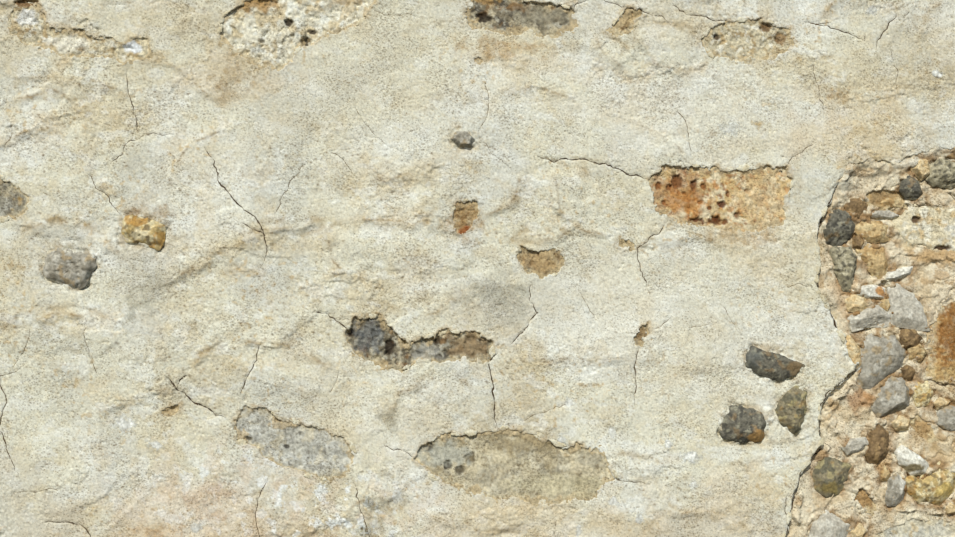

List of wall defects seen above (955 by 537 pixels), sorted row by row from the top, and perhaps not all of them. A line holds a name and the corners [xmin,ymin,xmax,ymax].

spalling [217,0,376,71]
spalling [465,0,578,39]
spalling [701,17,794,64]
spalling [0,174,29,223]
crack [207,152,303,268]
spalling [649,164,794,232]
spalling [517,246,565,279]
spalling [345,313,496,373]
spalling [780,145,955,537]
spalling [234,405,357,484]
spalling [414,426,619,507]